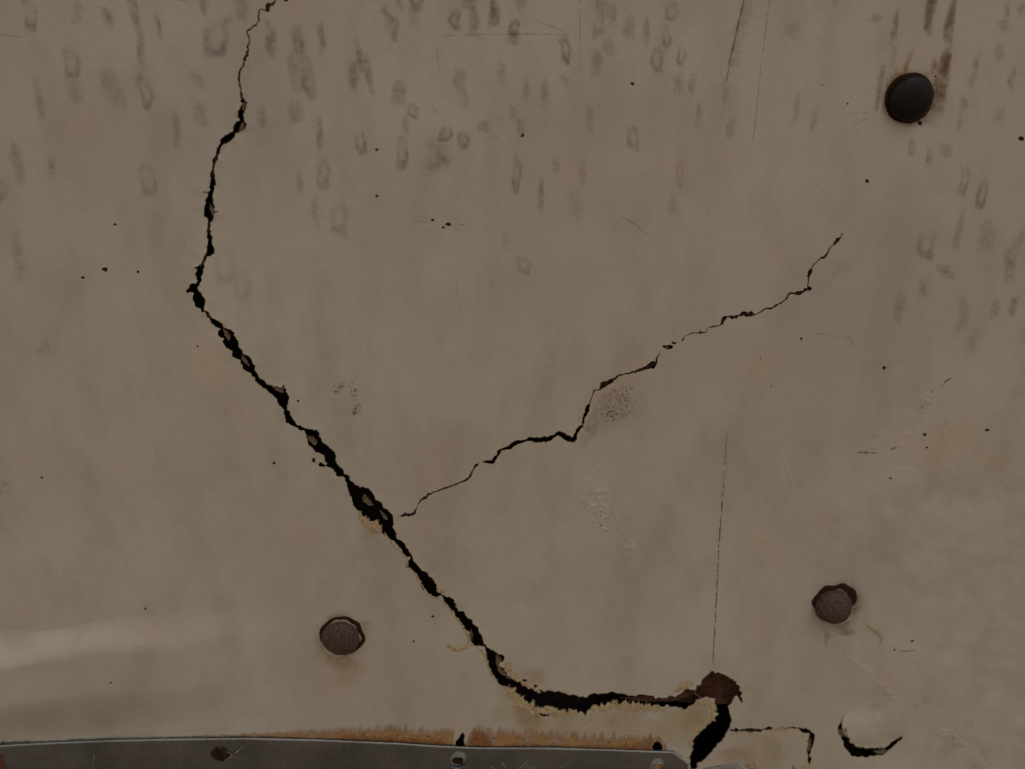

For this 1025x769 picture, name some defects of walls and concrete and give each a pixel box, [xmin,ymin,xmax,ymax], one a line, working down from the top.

crack [186,0,844,719]
rust [205,725,453,744]
rust [467,730,665,750]
peeling [842,693,927,748]